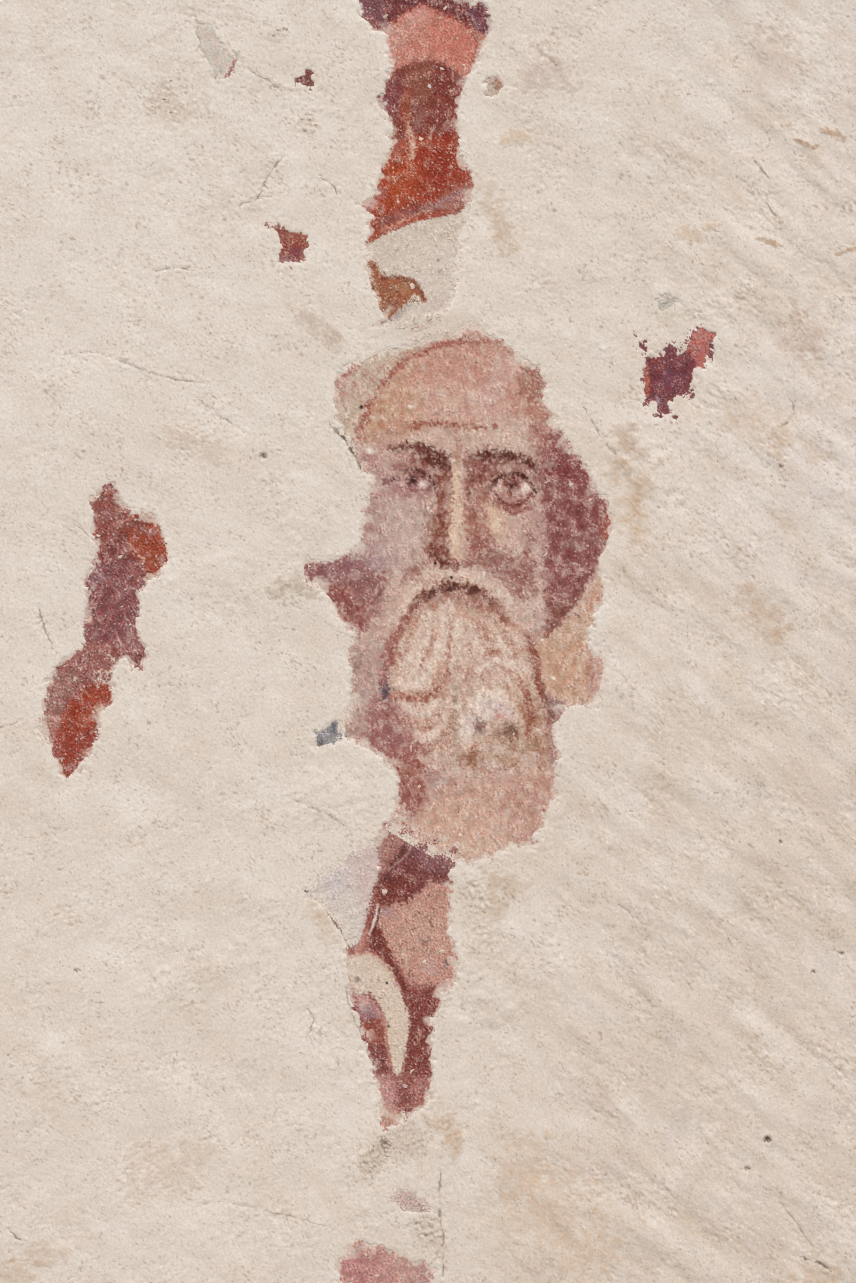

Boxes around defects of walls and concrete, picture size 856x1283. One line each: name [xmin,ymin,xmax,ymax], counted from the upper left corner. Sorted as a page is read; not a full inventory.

spalling [285,69,326,138]
peeling [302,0,615,1283]